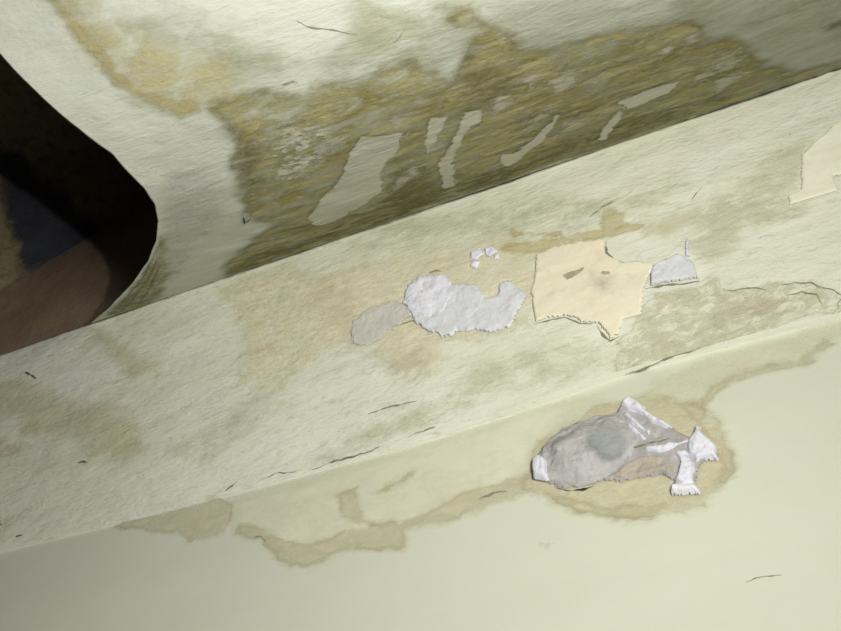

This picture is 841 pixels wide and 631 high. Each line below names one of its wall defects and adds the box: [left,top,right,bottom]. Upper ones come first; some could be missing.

damp [61,0,841,389]
peeling [788,121,841,204]
peeling [351,238,698,346]
damp [117,341,813,566]
spalling [532,397,719,496]